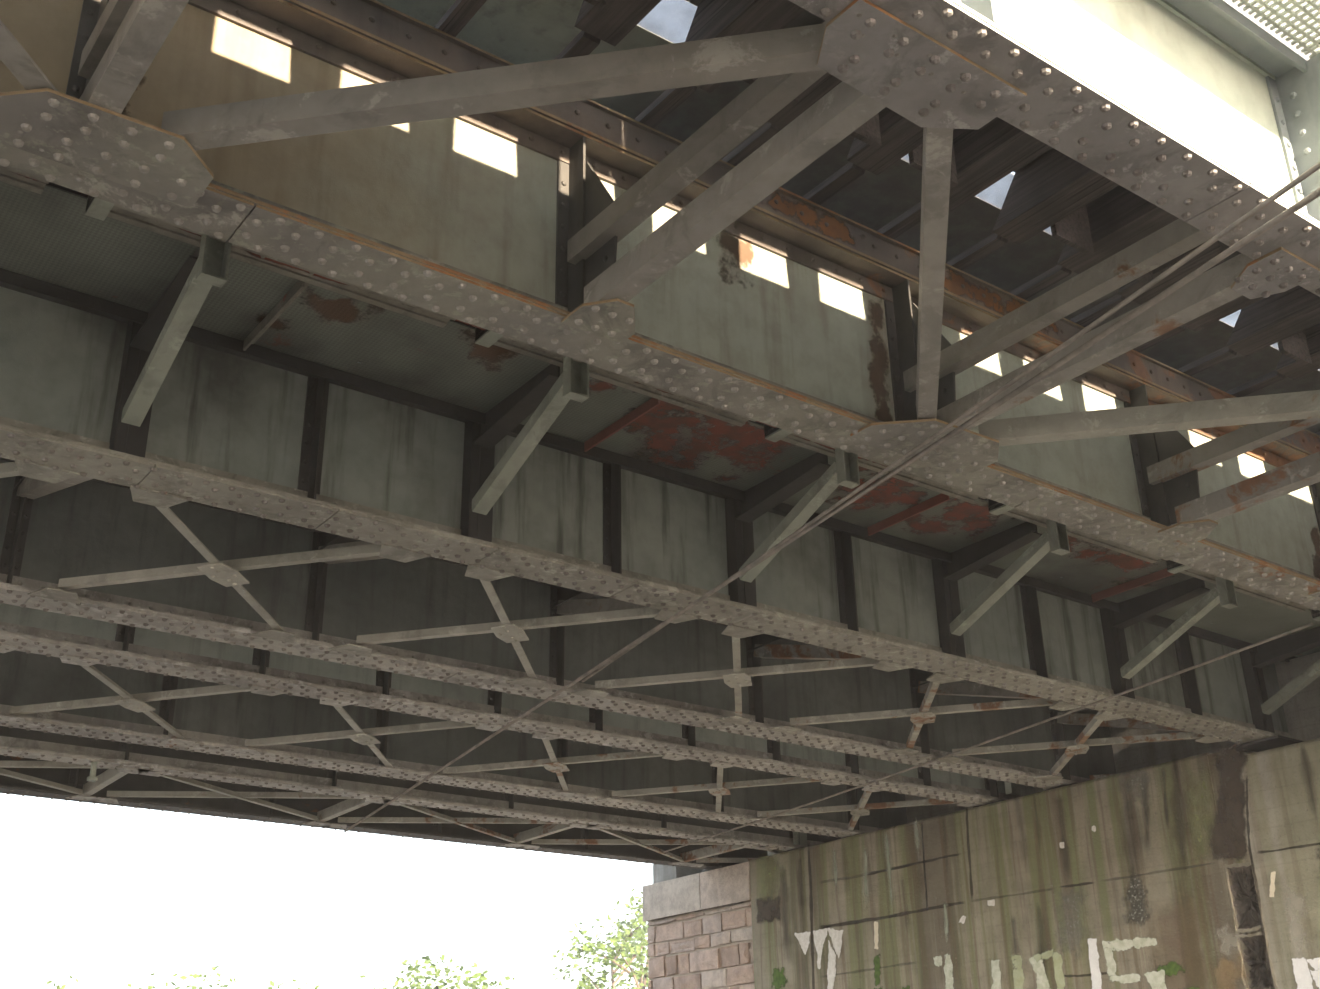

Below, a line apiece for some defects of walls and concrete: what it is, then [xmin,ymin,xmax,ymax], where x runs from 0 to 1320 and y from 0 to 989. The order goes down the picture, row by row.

rust [236,247,384,323]
rust [719,231,754,284]
rust [944,269,1024,316]
rust [455,319,520,371]
rust [868,302,893,422]
damp [1209,744,1247,860]
damp [1126,780,1150,925]